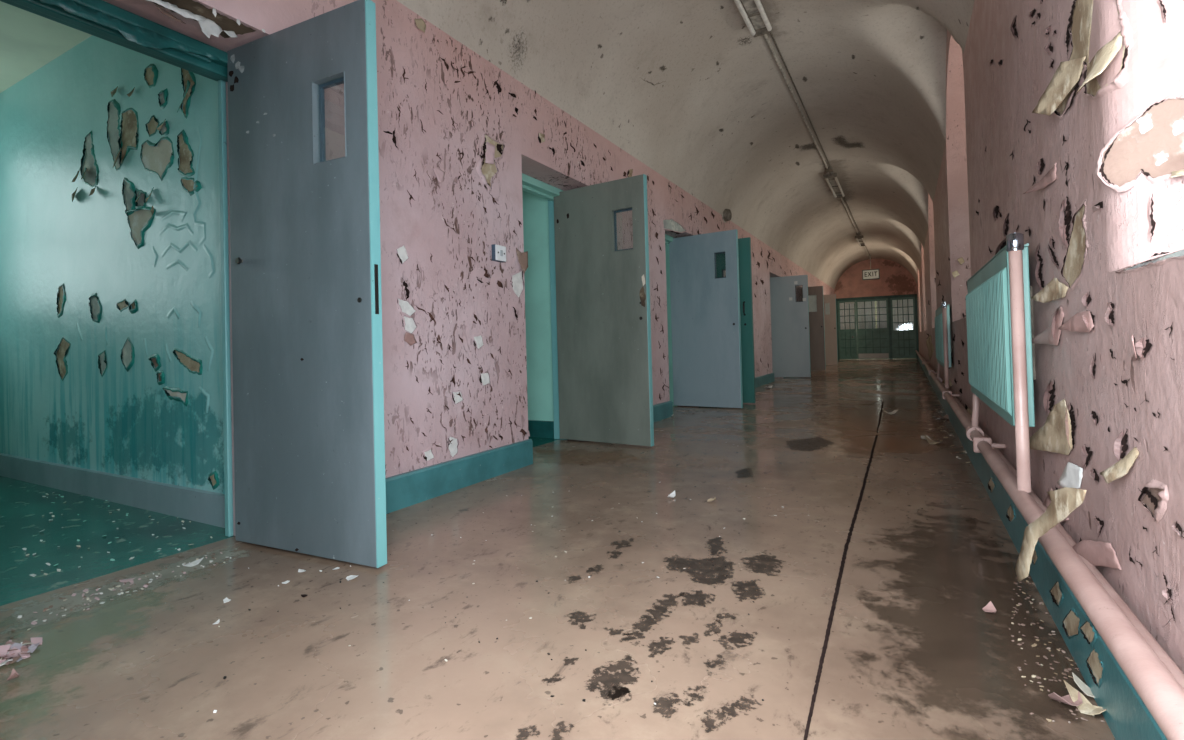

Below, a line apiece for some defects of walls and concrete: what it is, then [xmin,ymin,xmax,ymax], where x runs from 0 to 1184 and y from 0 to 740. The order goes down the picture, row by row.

crack [989,0,1057,71]
peeling [1032,0,1133,120]
crack [1156,0,1166,24]
peeling [72,131,99,202]
peeling [107,64,202,249]
peeling [1097,94,1184,192]
peeling [56,283,66,318]
crack [926,258,968,410]
peeling [1031,200,1094,346]
crack [976,119,1174,485]
crack [1064,517,1104,542]
crack [1129,521,1184,625]